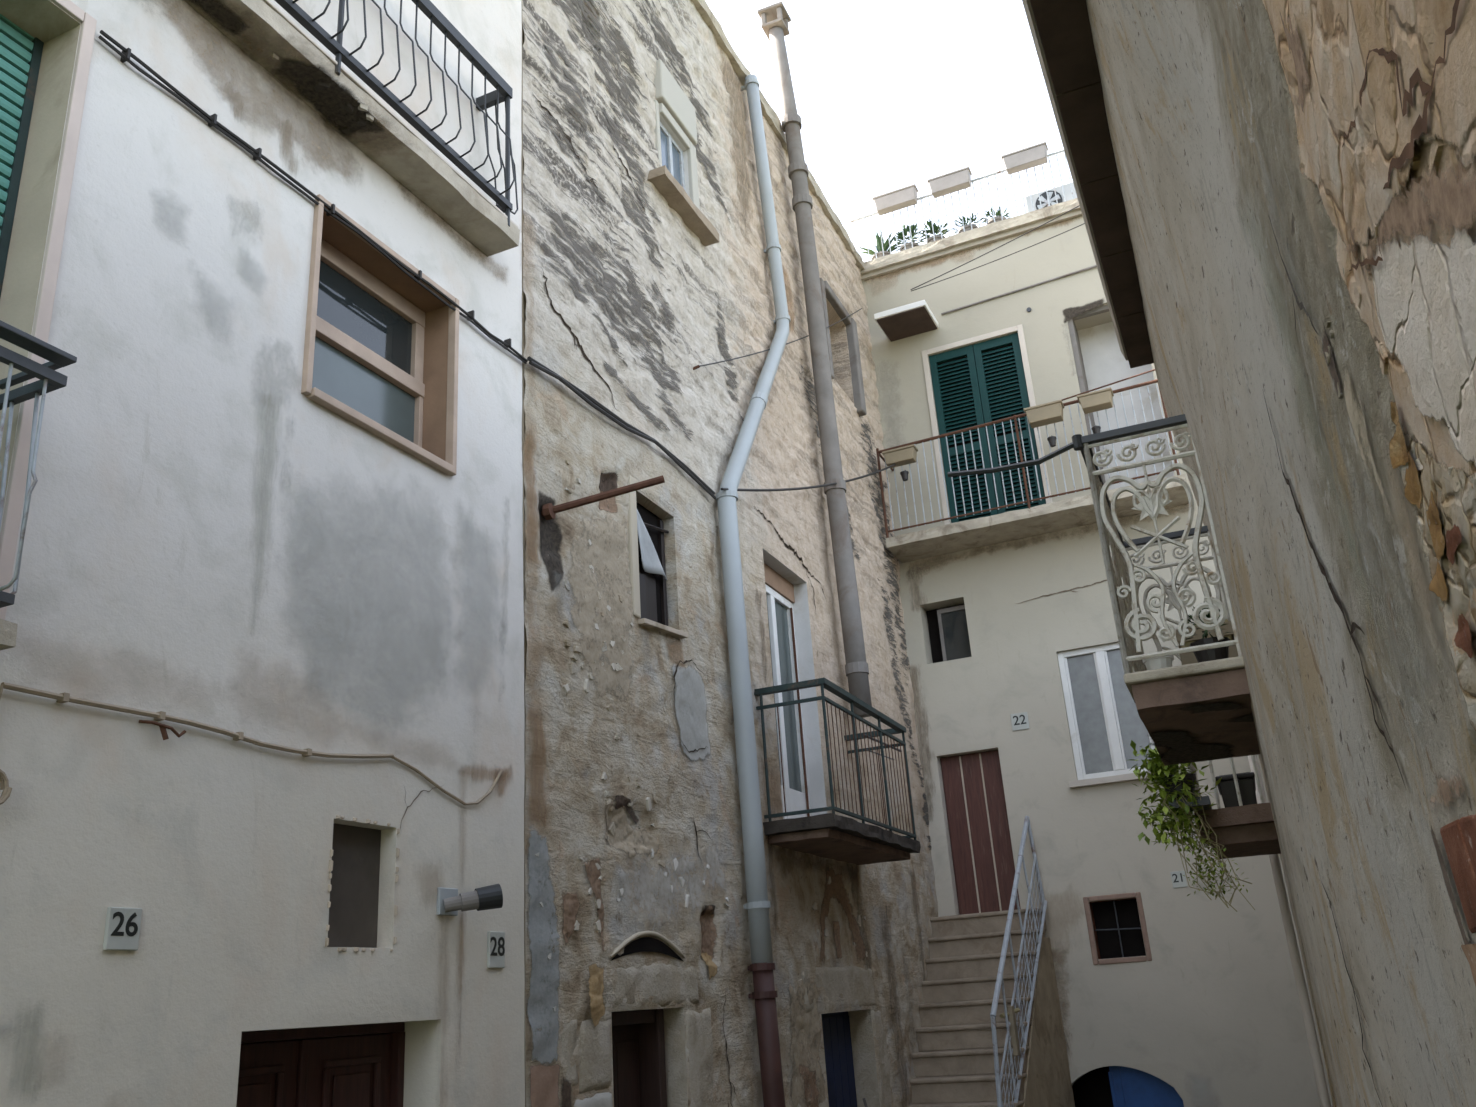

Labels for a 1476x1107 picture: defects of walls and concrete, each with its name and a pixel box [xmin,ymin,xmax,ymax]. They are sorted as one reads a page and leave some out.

crack [542,269,617,410]
crack [1268,215,1318,342]
flaking render [1262,0,1476,731]
crack [1263,392,1406,788]
flaking render [1430,776,1476,945]